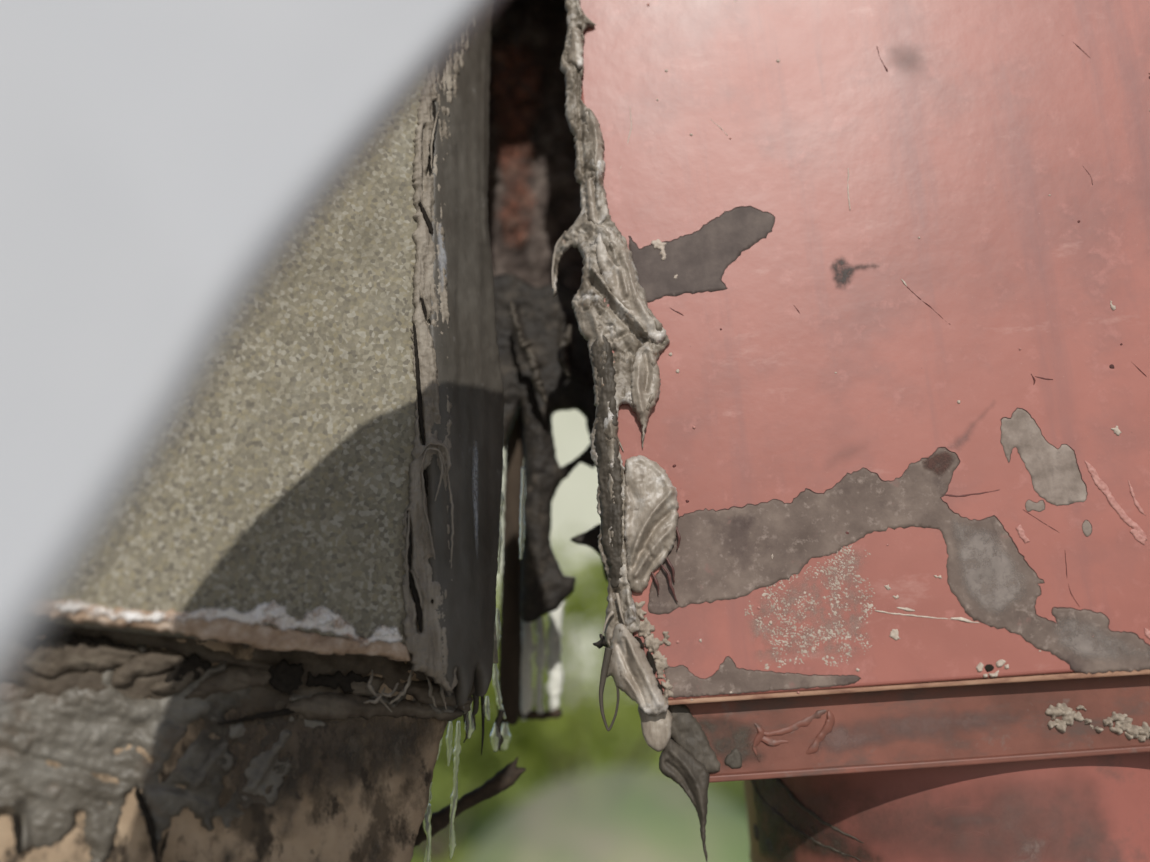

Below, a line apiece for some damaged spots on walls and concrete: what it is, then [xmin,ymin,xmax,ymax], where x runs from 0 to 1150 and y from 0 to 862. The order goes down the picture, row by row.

peeling [629,206,775,303]
peeling [1000,408,1147,545]
peeling [648,447,1150,674]
efflorescence [58,601,402,645]
spalling [52,600,411,661]
peeling [664,656,861,698]
hole [976,659,1009,678]